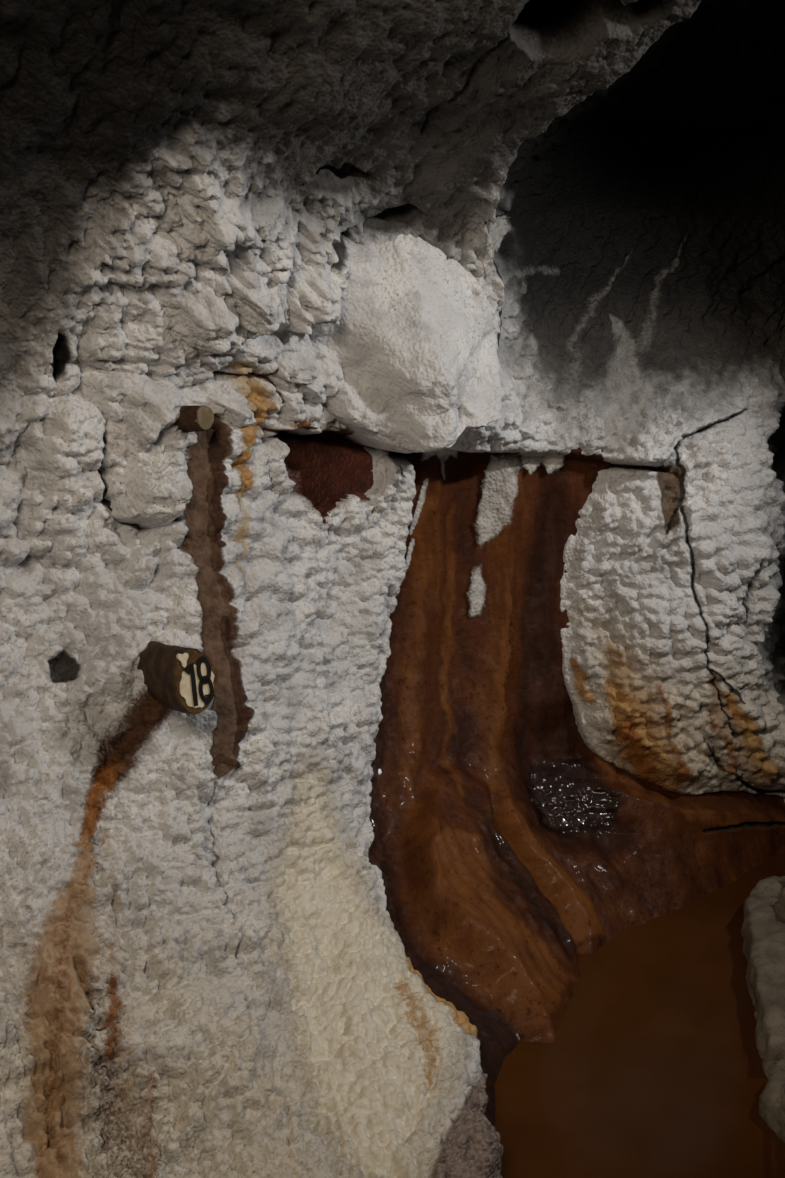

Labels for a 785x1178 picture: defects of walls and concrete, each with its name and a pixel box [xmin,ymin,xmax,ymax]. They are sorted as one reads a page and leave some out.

crack [493,259,503,347]
corrosion [228,361,278,594]
crack [206,367,406,478]
spalling [267,426,402,536]
crack [608,408,785,793]
corrosion [24,688,171,1178]
corrosion [368,448,785,1126]
crack [703,822,785,836]